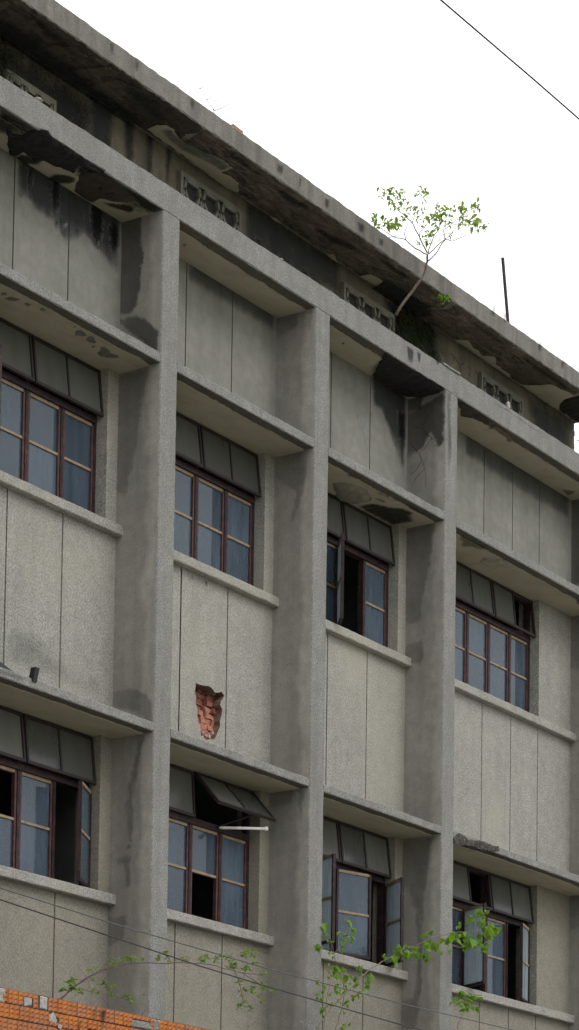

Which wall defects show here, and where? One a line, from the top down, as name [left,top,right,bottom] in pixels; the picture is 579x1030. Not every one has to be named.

spalling [0,0,579,422]
damp [15,155,158,350]
spalling [195,683,224,740]
peeling [24,996,62,1029]
peeling [131,1019,160,1030]